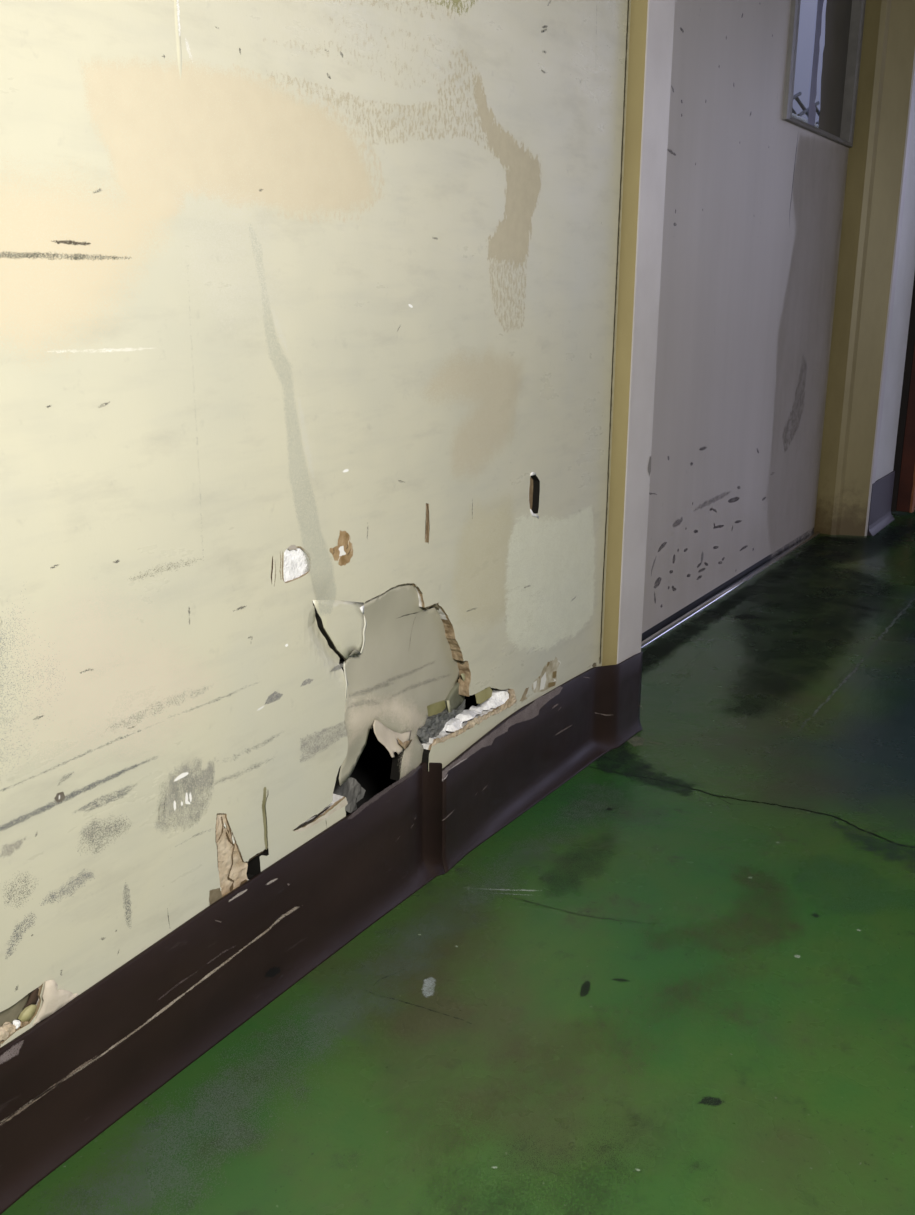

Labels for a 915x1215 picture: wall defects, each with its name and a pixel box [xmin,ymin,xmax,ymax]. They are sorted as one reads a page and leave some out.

flaking render [271,545,311,586]
peeling [329,530,353,566]
spalling [519,657,561,702]
spalling [438,687,499,735]
spalling [350,724,393,798]
crack [588,742,915,873]
spalling [0,980,78,1042]